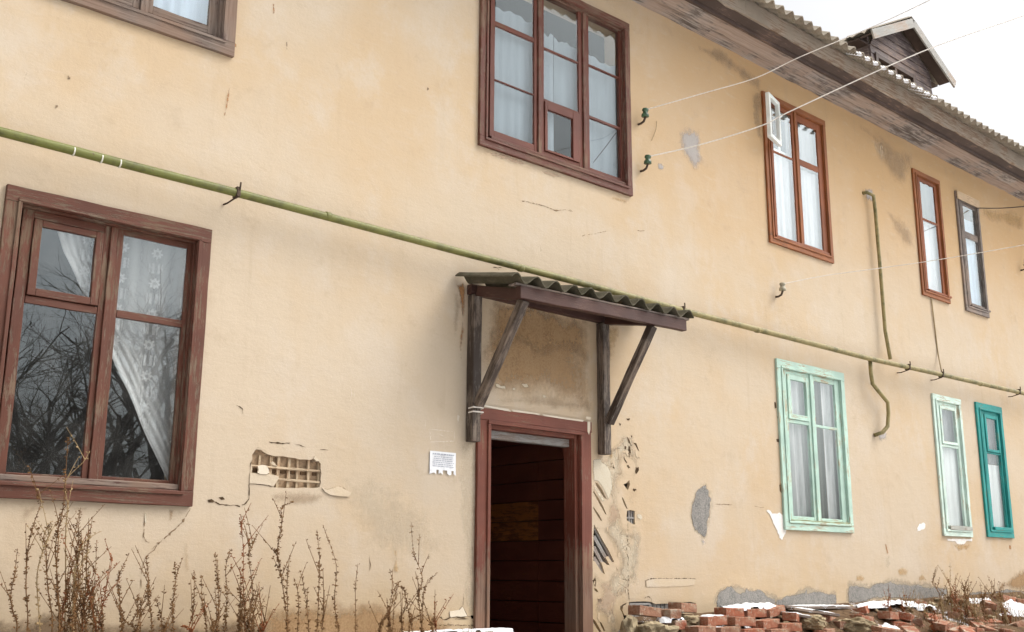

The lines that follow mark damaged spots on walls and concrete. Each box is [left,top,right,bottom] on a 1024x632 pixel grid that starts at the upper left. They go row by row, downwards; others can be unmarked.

leakage [491,306,583,401]
spalling [249,450,352,497]
spalling [593,435,696,628]